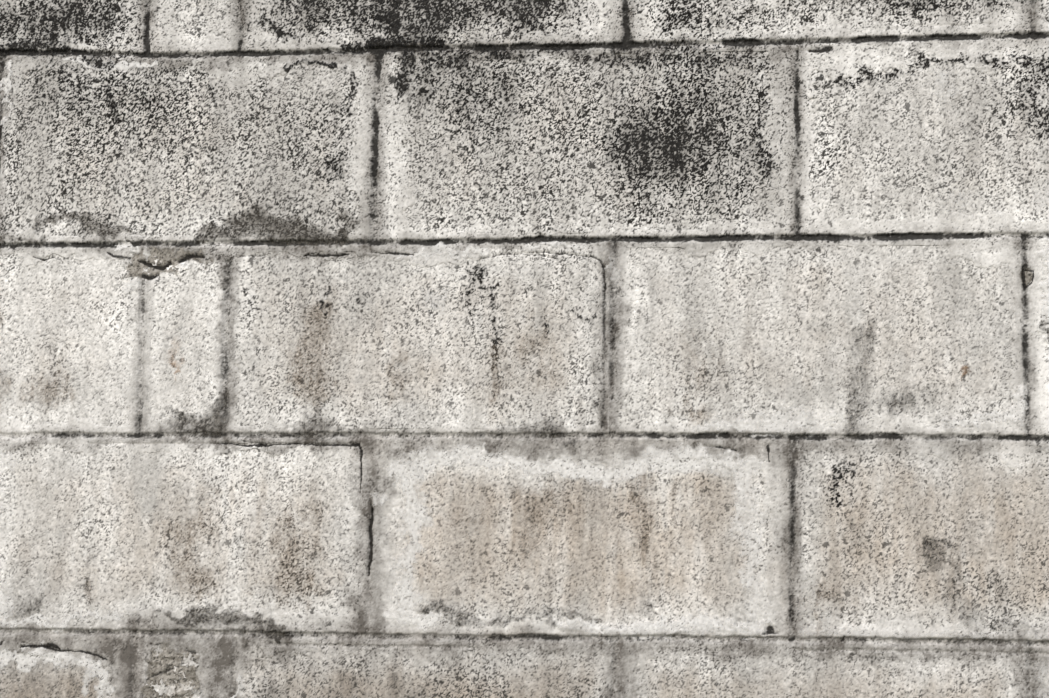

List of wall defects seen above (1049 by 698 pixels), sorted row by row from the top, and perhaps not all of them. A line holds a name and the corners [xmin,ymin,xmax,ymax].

mould [892,0,949,13]
mould [258,0,777,198]
spalling [122,247,214,281]
crack [0,640,107,660]